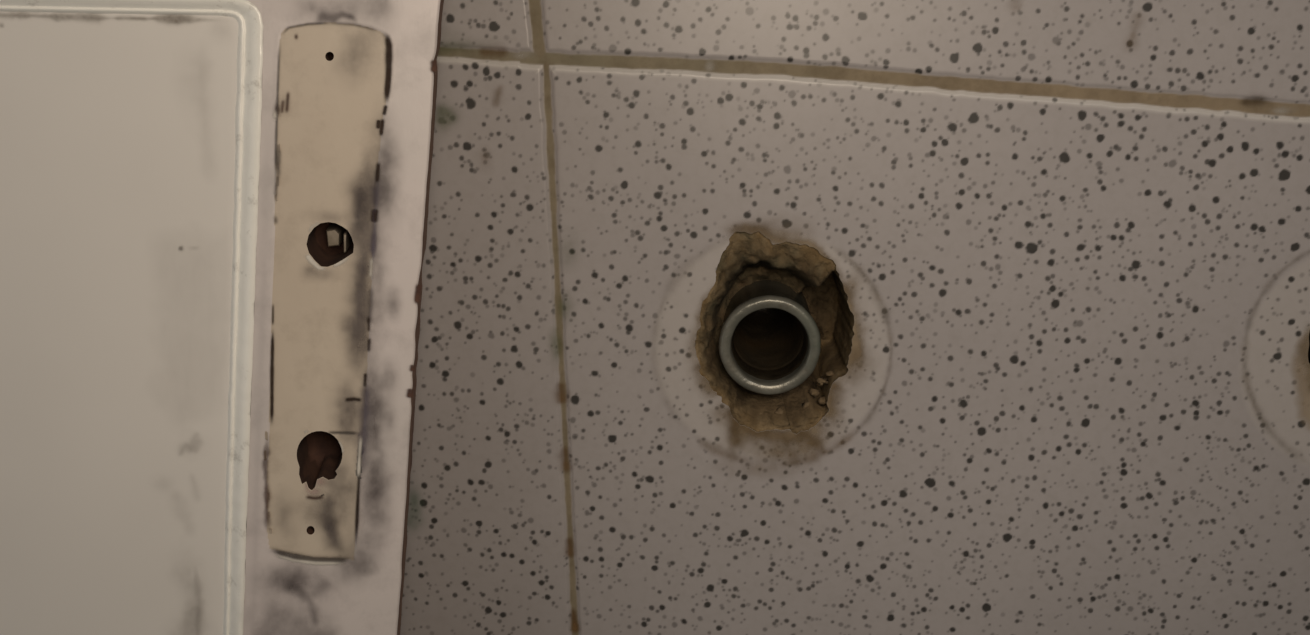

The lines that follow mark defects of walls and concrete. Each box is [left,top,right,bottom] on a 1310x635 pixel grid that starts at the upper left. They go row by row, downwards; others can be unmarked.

spalling [695,227,863,443]